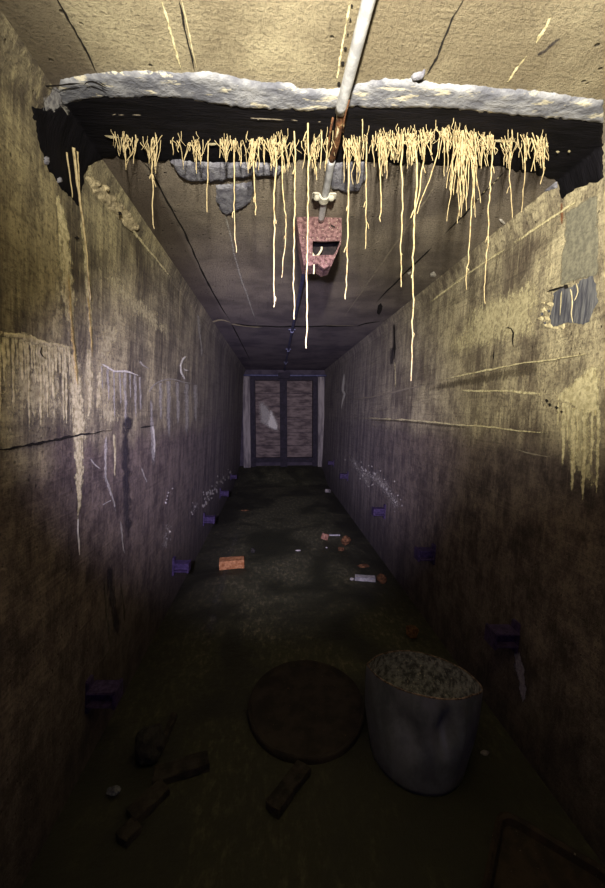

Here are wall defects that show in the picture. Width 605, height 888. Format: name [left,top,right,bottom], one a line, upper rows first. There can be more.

crack [45,0,107,89]
crack [411,1,463,84]
corrosion [328,99,350,163]
peeling [170,159,284,216]
peeling [331,161,366,193]
leakage [451,281,537,355]
peeling [538,276,598,330]
leakage [0,195,198,555]
crack [0,429,114,450]
leakage [463,367,601,499]